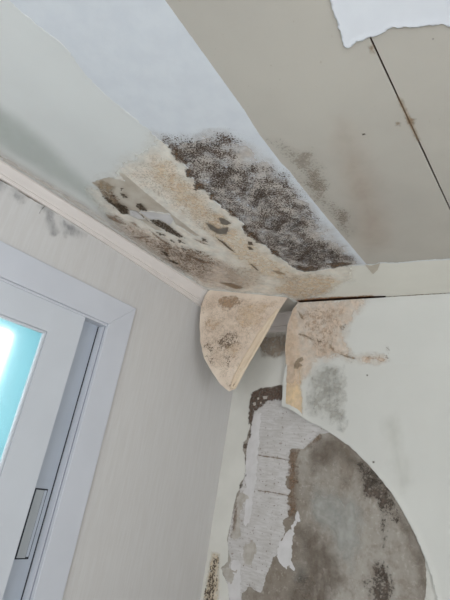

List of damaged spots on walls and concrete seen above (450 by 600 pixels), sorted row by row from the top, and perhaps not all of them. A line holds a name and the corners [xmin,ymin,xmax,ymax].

crack [370,38,450,208]
leakage [96,128,363,425]
crack [297,293,446,303]
leakage [348,459,399,548]
leakage [203,558,219,600]
leakage [364,563,394,600]